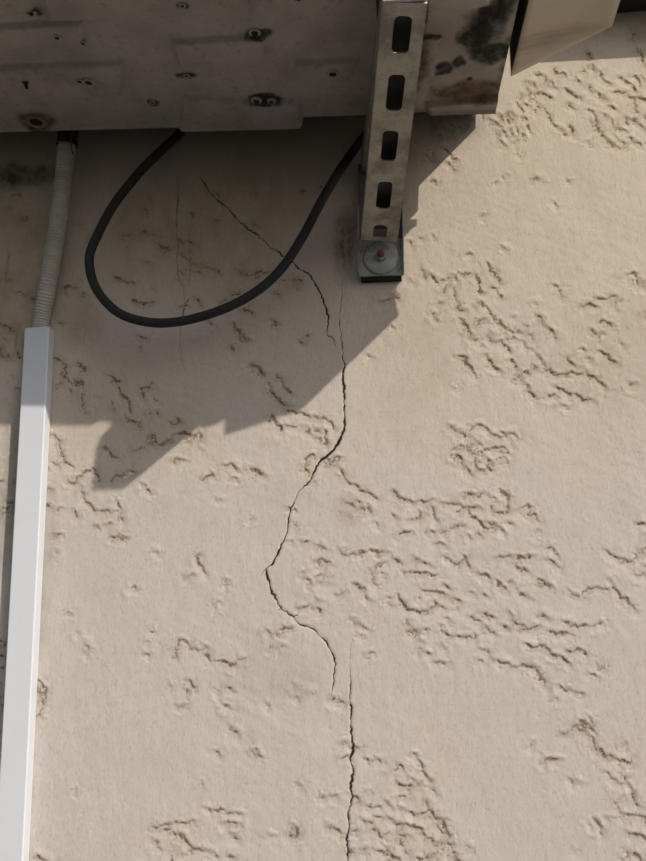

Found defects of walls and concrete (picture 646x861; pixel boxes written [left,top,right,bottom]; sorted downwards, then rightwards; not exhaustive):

crack [201,179,355,861]